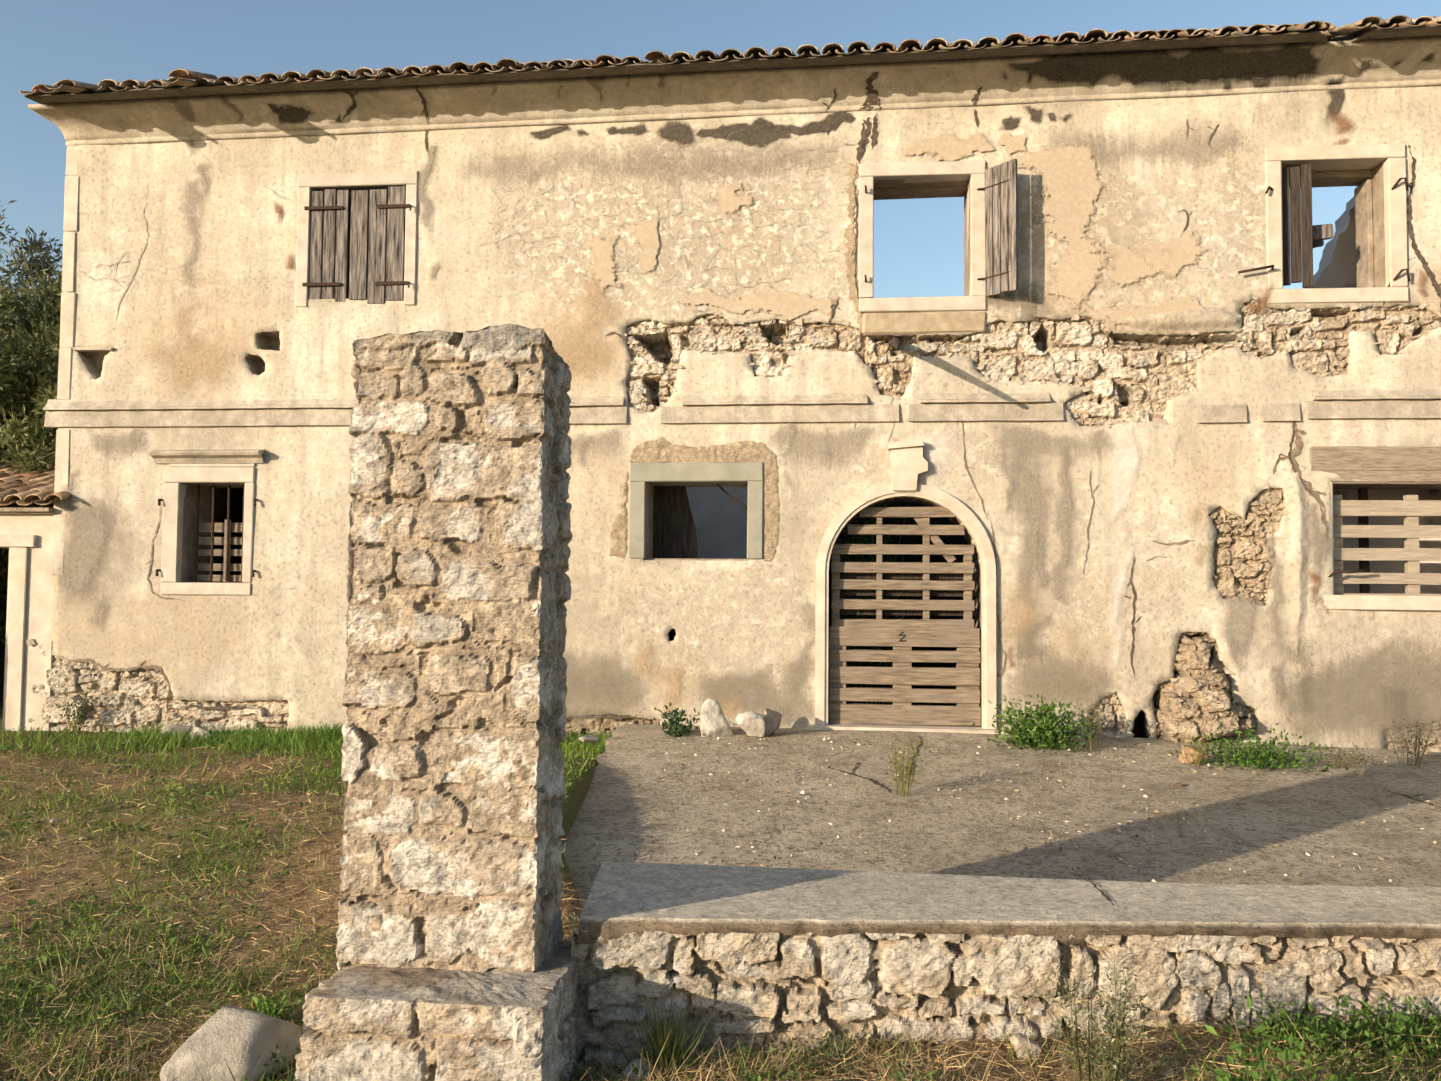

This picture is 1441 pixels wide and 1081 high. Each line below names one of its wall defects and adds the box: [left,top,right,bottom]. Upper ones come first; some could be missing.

water stain [531,125,588,139]
water stain [578,111,855,173]
water stain [1003,43,1344,118]
peeling [588,234,621,291]
spalling [624,131,1441,428]
crack [1383,144,1441,323]
crack [961,403,1007,669]
water stain [1000,426,1138,628]
spalling [1208,485,1289,606]
crack [1273,421,1329,539]
crack [1124,540,1196,677]
spalling [26,639,289,734]